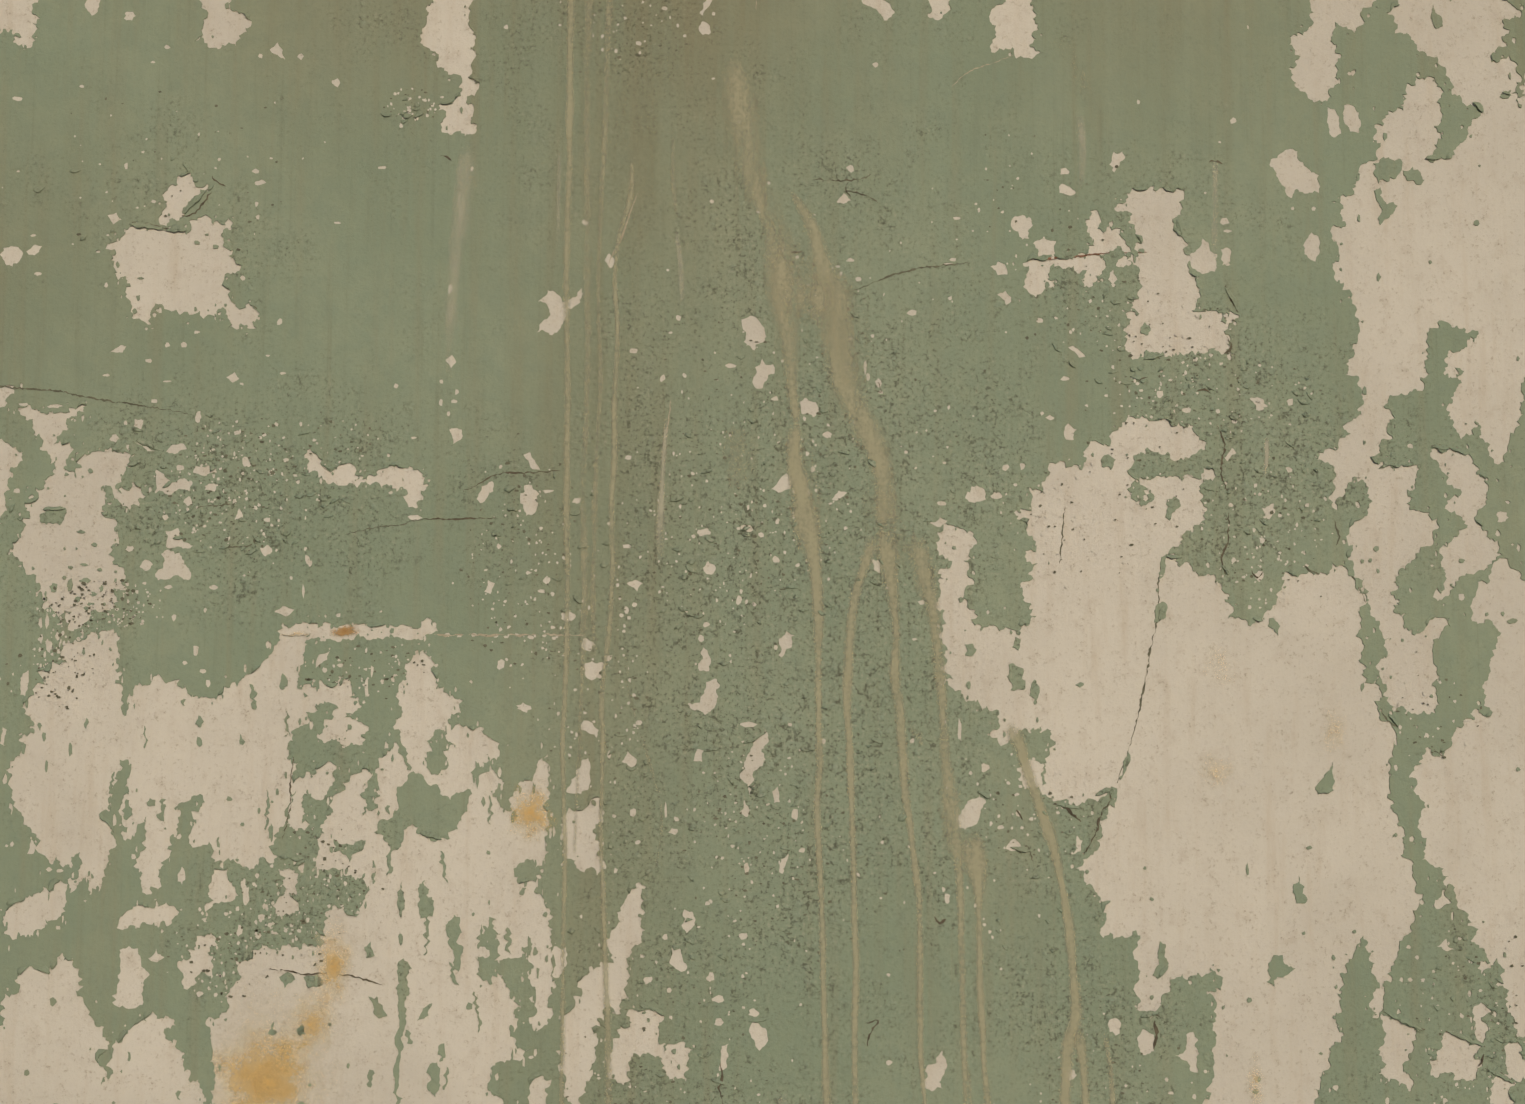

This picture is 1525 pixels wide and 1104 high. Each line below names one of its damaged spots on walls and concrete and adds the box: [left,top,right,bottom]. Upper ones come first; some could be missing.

peeling [0,0,40,50]
peeling [196,0,252,49]
peeling [380,0,480,135]
peeling [0,234,42,276]
peeling [72,138,282,347]
peeling [538,289,583,335]
peeling [0,304,917,1104]
water stain [561,0,634,956]
water stain [729,66,990,1104]
crack [1016,555,1167,860]
peeling [917,0,1525,1104]
water stain [1009,728,1088,1104]